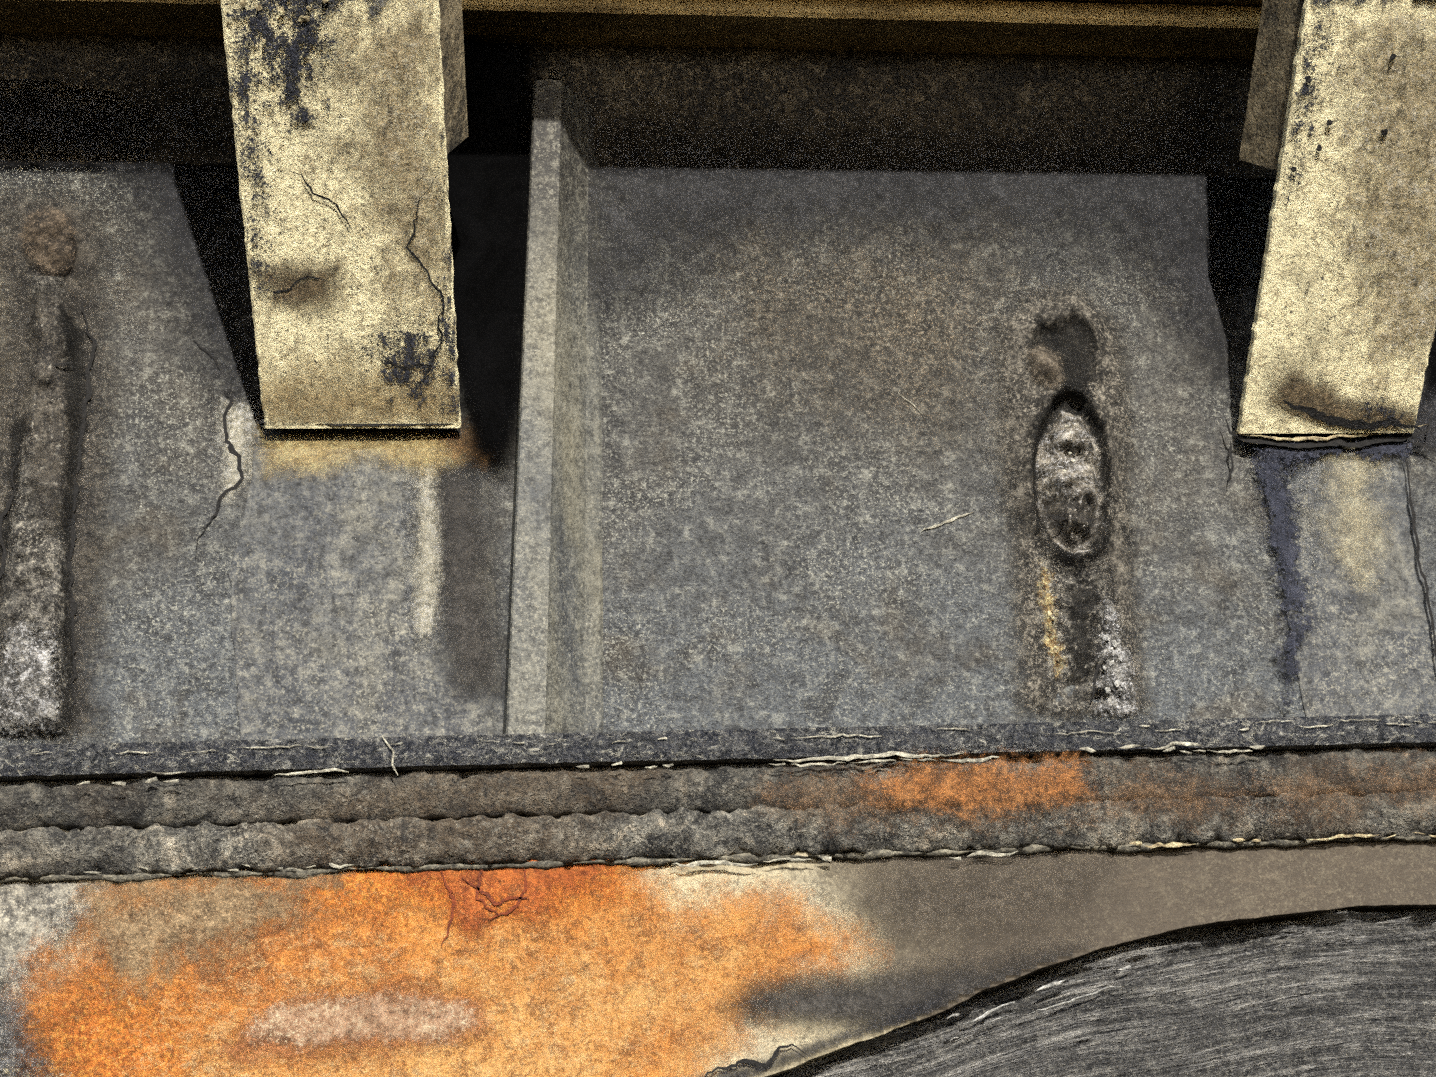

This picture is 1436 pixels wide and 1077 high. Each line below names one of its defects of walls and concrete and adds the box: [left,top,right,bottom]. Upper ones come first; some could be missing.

crack [193,0,459,559]
crack [1223,411,1436,657]
leakage [1248,371,1436,709]
corrosion [885,764,1084,807]
corrosion [23,859,852,1077]